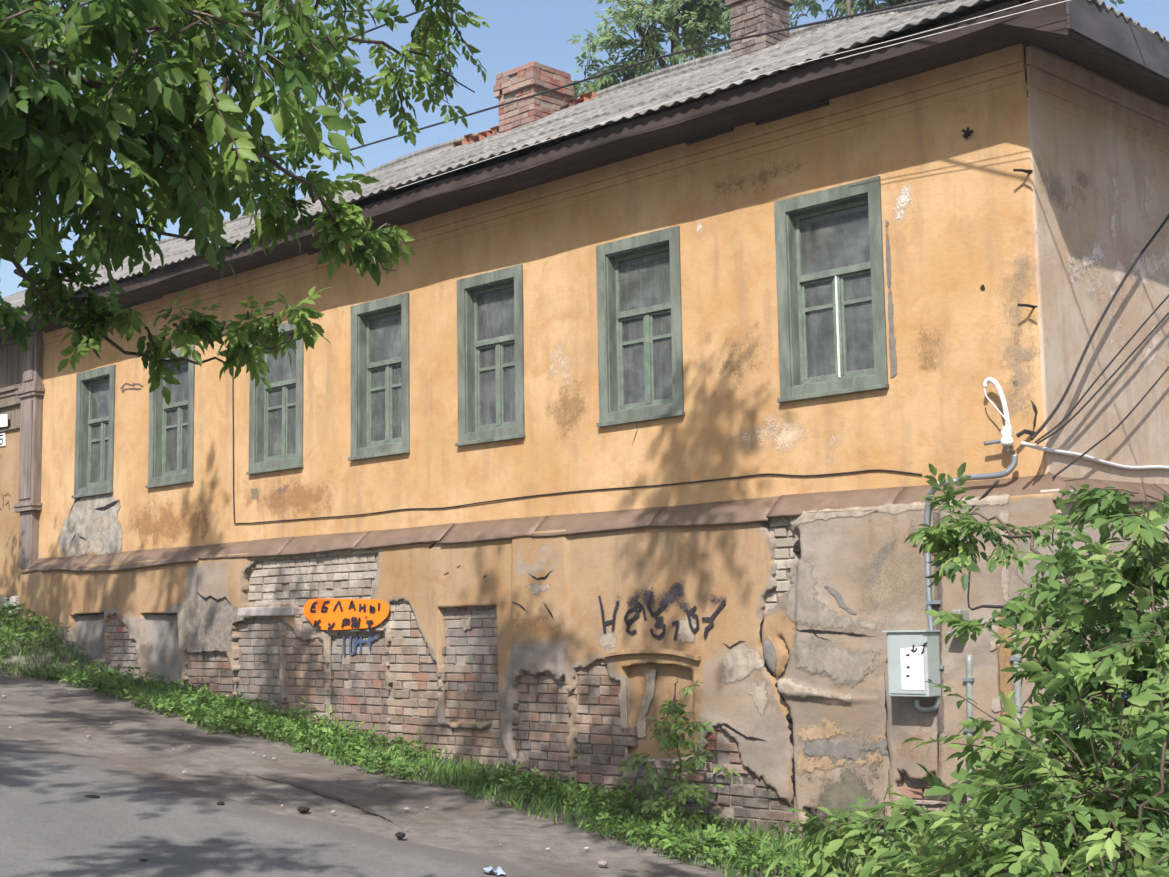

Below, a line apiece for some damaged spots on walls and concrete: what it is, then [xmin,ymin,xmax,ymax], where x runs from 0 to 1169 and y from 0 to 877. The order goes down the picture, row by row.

leakage [1005,257,1036,412]
leakage [547,340,584,433]
spalling [58,495,122,557]
flaking render [107,614,139,678]
flaking render [182,549,797,838]
crack [717,617,875,813]
flaking render [808,808,843,837]